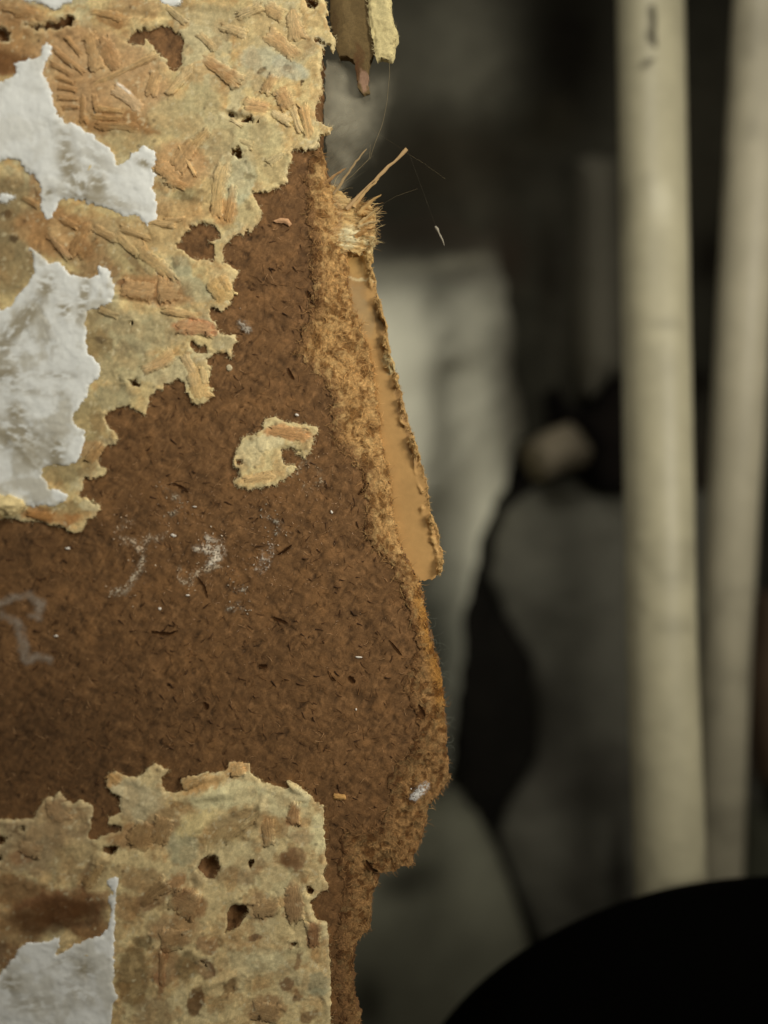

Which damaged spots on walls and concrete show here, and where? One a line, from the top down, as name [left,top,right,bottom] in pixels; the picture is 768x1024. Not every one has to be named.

peeling [0,247,116,508]
peeling [345,196,446,581]
peeling [0,876,118,1024]